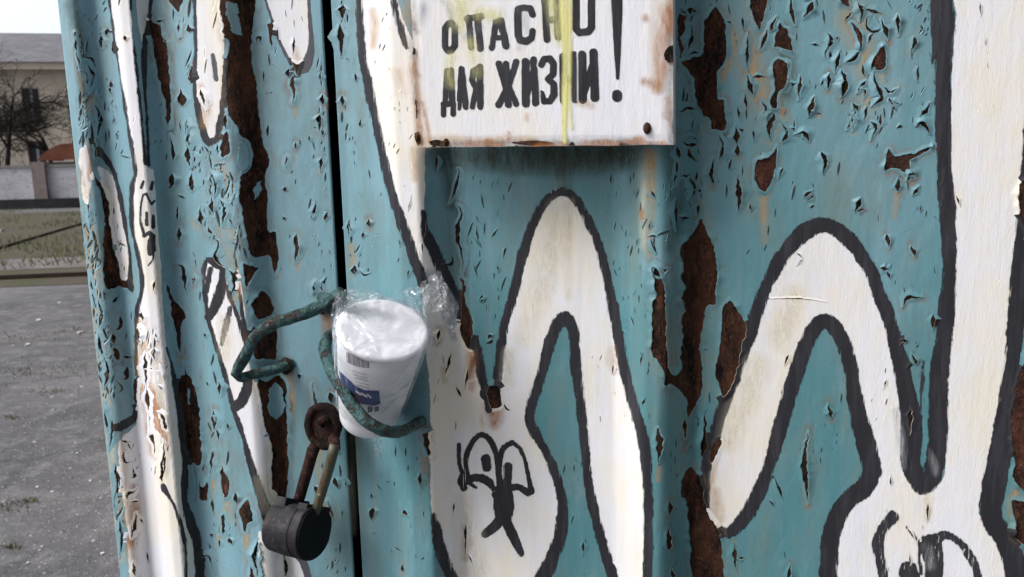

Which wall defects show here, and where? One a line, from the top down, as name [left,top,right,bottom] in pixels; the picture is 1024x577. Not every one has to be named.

peeling [70,28,94,95]
peeling [675,2,734,134]
peeling [745,0,799,114]
peeling [831,0,891,75]
peeling [81,110,134,310]
peeling [751,142,783,197]
peeling [878,140,937,179]
peeling [643,215,751,421]
peeling [129,279,259,538]